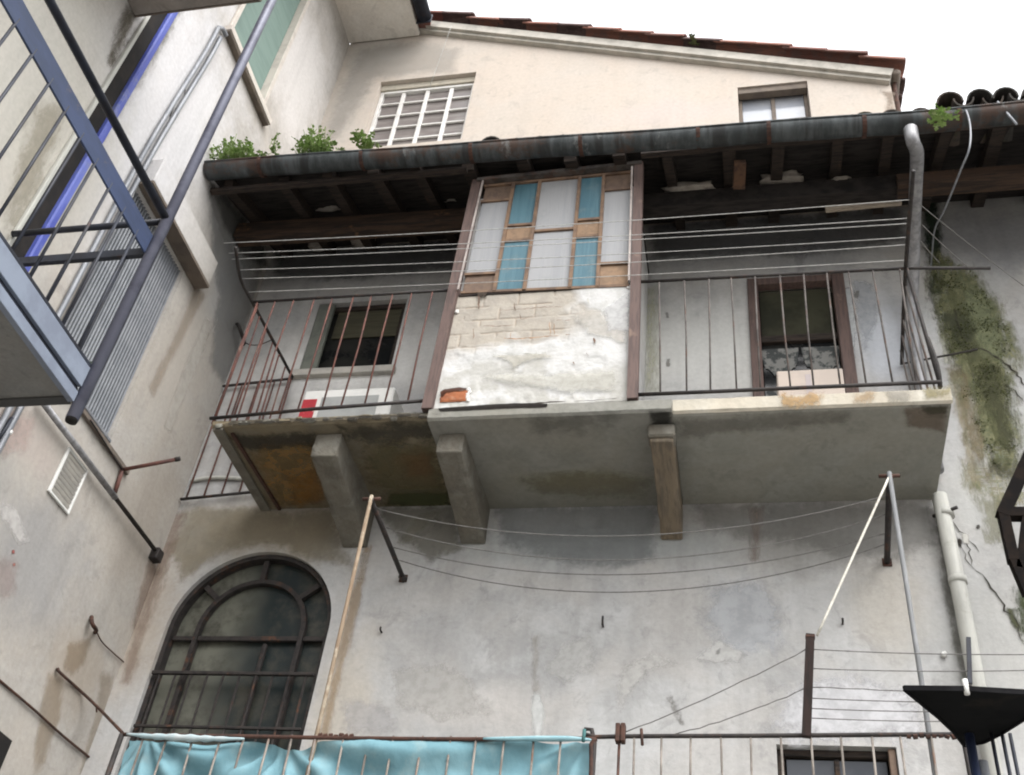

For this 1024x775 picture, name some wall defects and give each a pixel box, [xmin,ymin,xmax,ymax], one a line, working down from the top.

spalling [440,387,472,402]
corrosion [781,392,820,406]
water stain [906,331,976,487]
corrosion [233,433,323,508]
water stain [382,506,459,558]
crack [953,522,1023,641]